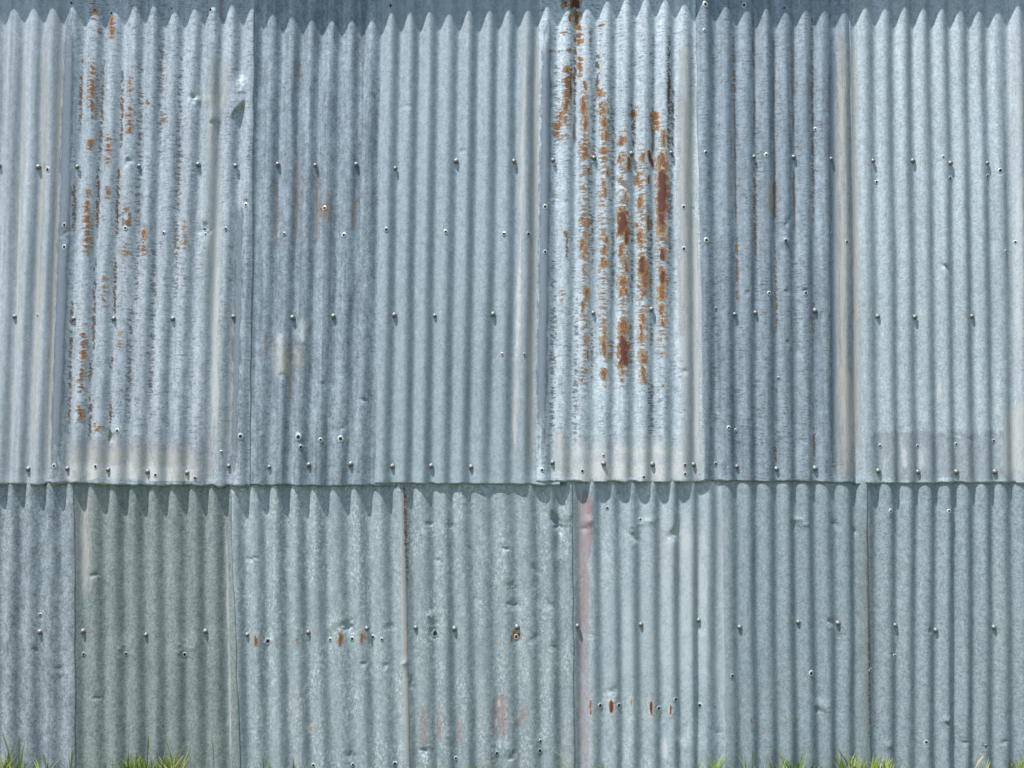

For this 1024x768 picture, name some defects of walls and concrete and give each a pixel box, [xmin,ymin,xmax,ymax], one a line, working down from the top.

rust [90,0,115,42]
rust [546,0,675,390]
rust [67,55,189,447]
rust [607,698,616,717]
rust [647,699,674,718]